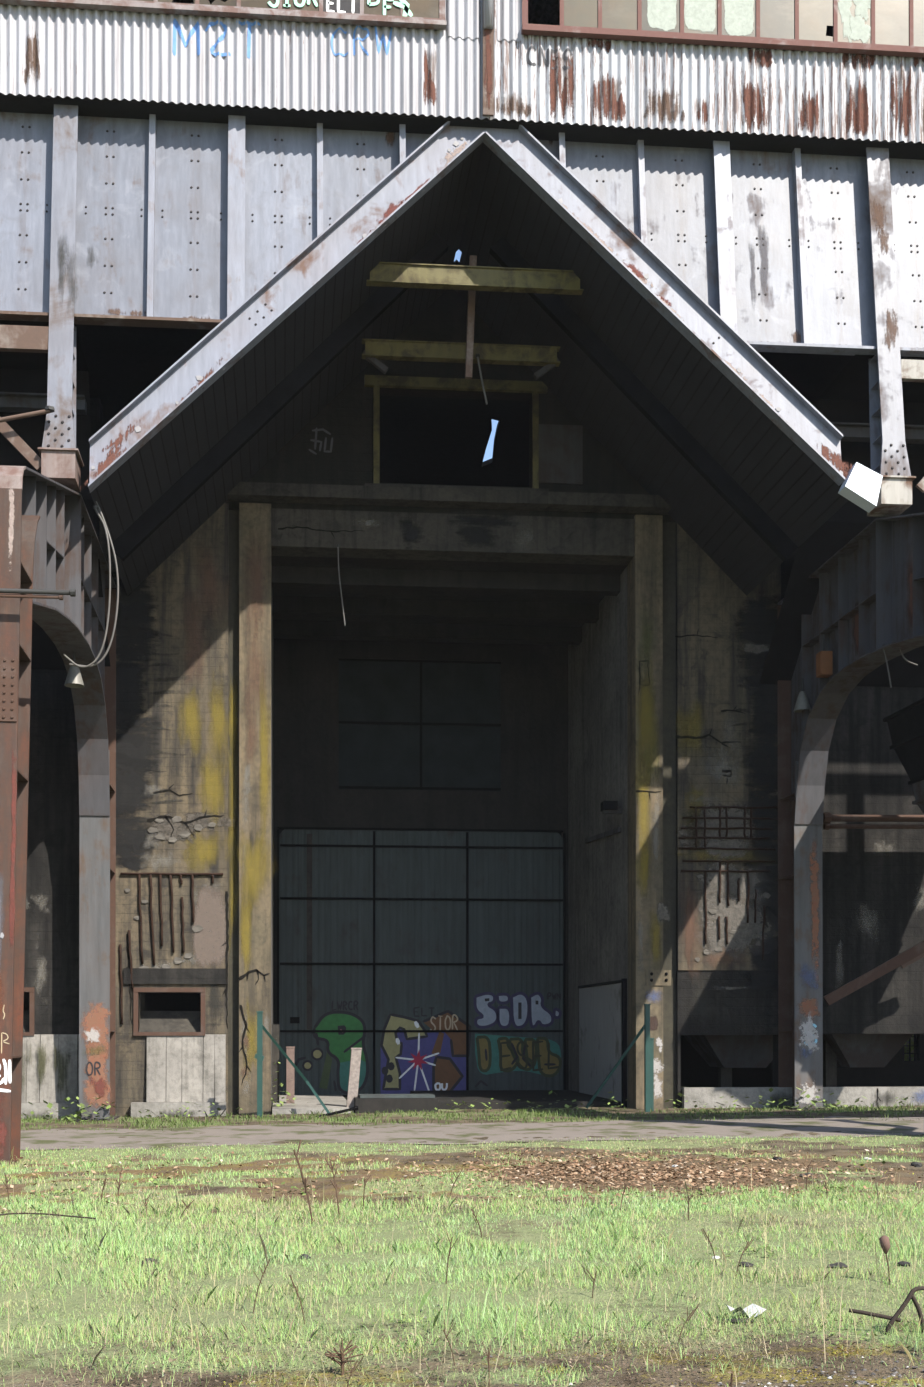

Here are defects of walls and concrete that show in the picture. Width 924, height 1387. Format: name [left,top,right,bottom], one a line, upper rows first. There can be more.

corrosion [24,34,40,84]
corrosion [423,51,437,105]
corrosion [484,29,531,116]
corrosion [549,55,574,119]
corrosion [593,73,626,122]
corrosion [644,89,708,123]
corrosion [743,82,767,129]
corrosion [748,49,772,70]
corrosion [798,91,819,132]
corrosion [842,53,875,134]
corrosion [890,57,924,136]
corrosion [885,310,898,349]